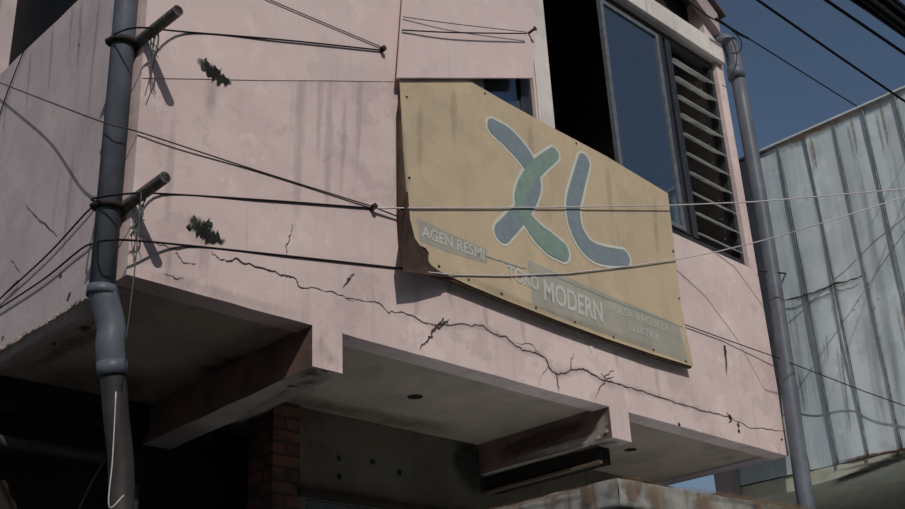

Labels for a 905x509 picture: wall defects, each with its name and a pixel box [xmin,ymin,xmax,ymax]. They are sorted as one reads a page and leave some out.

spalling [199,58,231,86]
spalling [187,215,224,244]
crack [140,226,785,432]
damp [839,451,905,482]
corrosion [494,488,594,509]